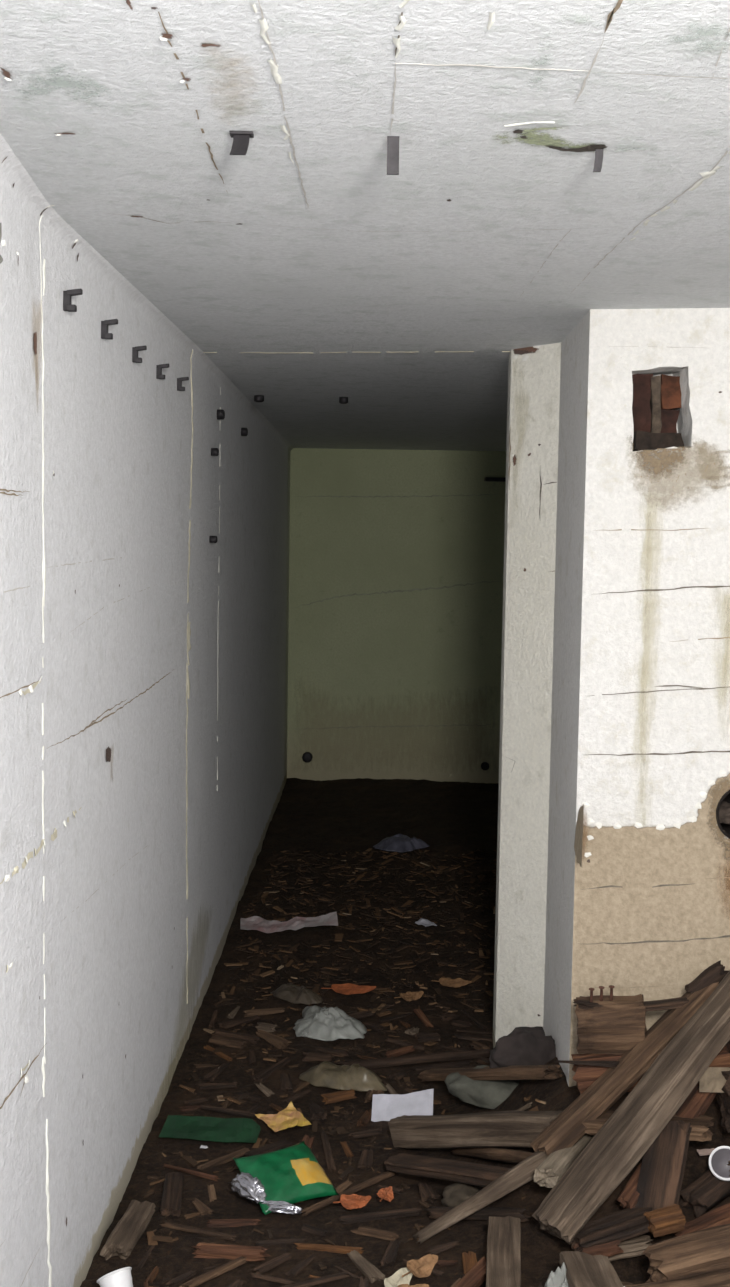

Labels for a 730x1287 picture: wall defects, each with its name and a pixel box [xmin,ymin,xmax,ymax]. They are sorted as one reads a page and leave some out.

crack [574,0,730,103]
crack [158,12,228,223]
crack [258,0,312,220]
spalling [499,122,616,152]
crack [0,488,29,496]
leakage [632,443,685,477]
crack [602,586,730,594]
crack [48,670,173,748]
crack [592,685,726,696]
crack [589,749,730,757]
peeling [569,770,730,1087]
crack [0,1043,47,1109]